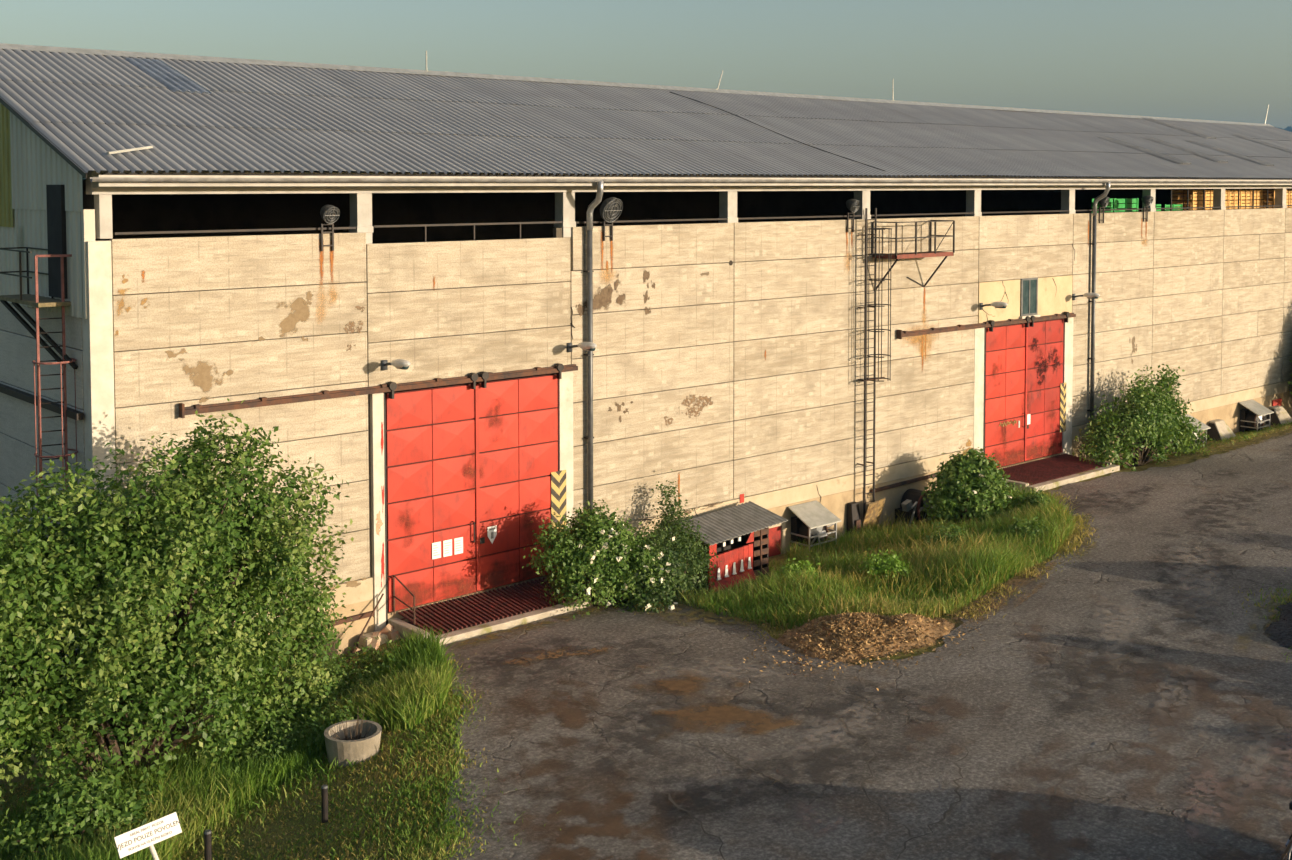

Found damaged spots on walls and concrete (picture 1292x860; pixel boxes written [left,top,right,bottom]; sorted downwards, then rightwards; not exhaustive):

corrosion [320,240,334,280]
corrosion [601,232,613,272]
peeling [258,291,313,341]
peeling [165,349,233,403]
spalling [664,395,713,425]